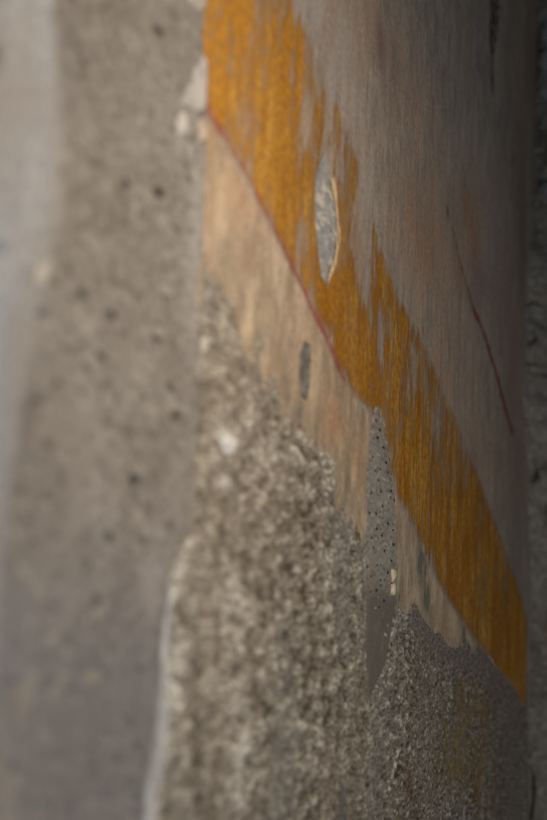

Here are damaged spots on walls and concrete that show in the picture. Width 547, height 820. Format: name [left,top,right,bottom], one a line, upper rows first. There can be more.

spalling [490,0,500,53]
spalling [315,153,340,284]